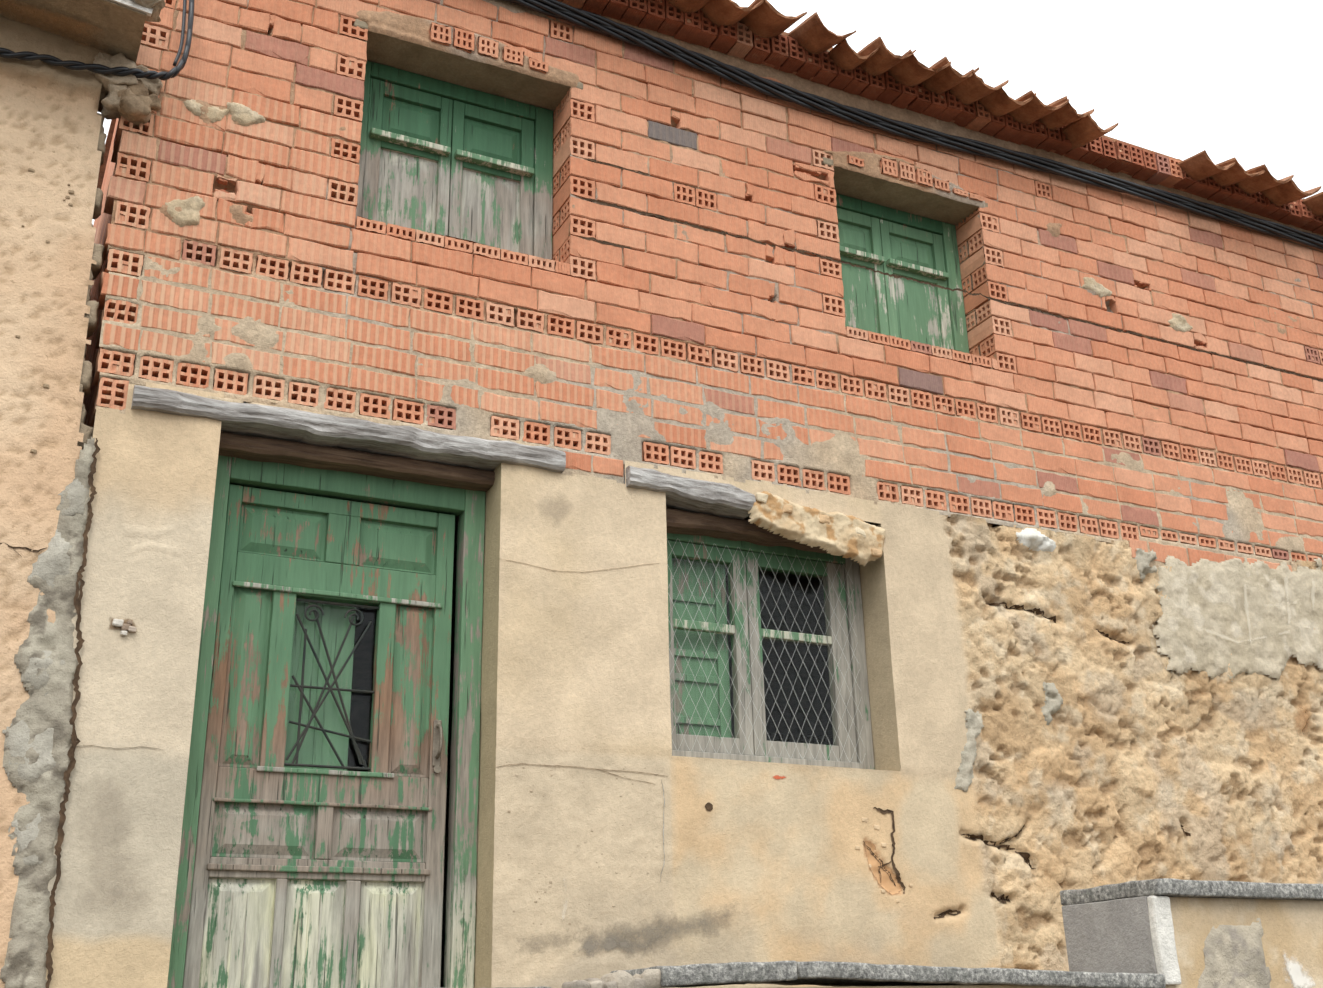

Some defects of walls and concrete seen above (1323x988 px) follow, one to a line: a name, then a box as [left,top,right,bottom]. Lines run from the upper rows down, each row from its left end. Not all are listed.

flaking render [748,491,886,566]
crack [863,807,906,894]
crack [934,909,961,919]